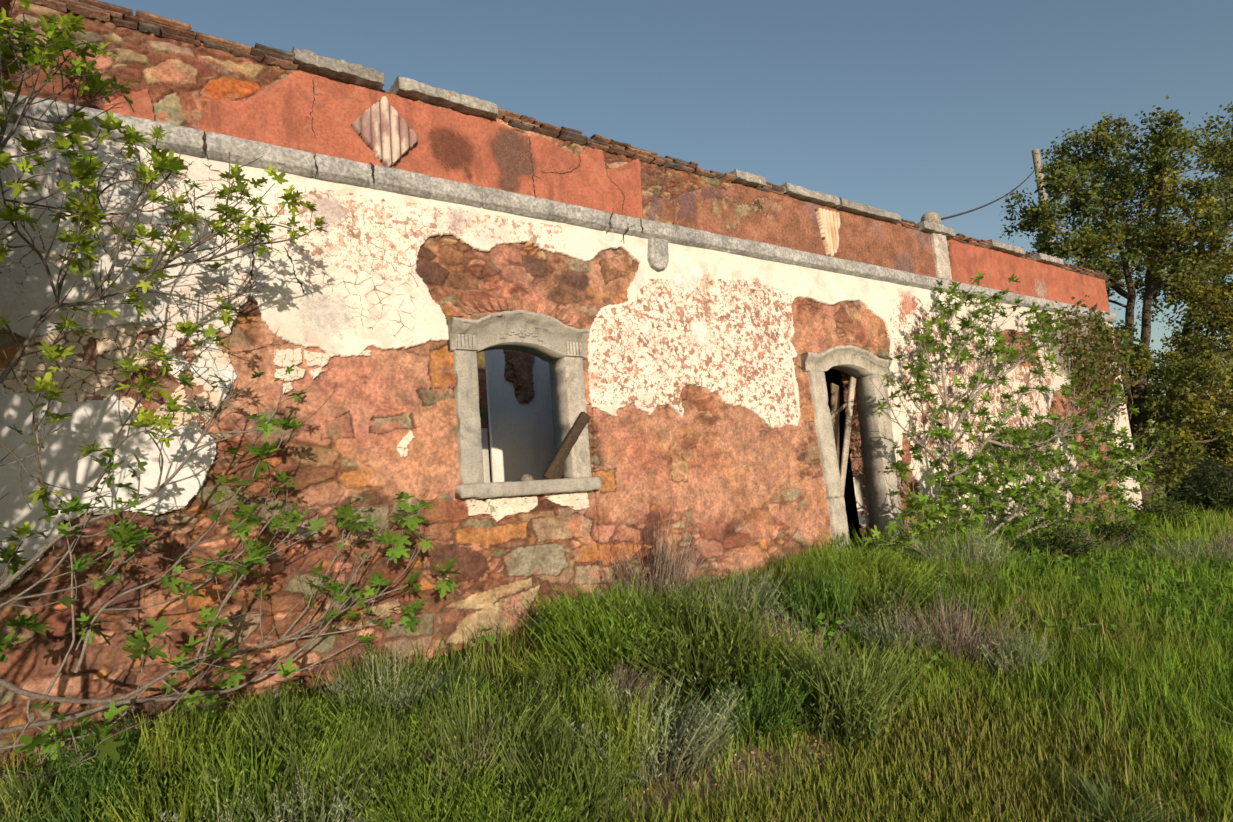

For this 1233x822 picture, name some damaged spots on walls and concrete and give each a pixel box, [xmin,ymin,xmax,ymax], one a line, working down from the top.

crack [0,130,438,342]
crack [304,79,320,178]
water stain [429,129,475,178]
water stain [492,128,534,192]
crack [528,137,644,242]
spalling [643,192,680,225]
spalling [712,195,783,231]
flaking render [0,324,237,428]
flaking render [273,348,371,394]
peeling [591,279,799,428]
flaking render [396,430,414,457]
flaking render [465,491,590,522]